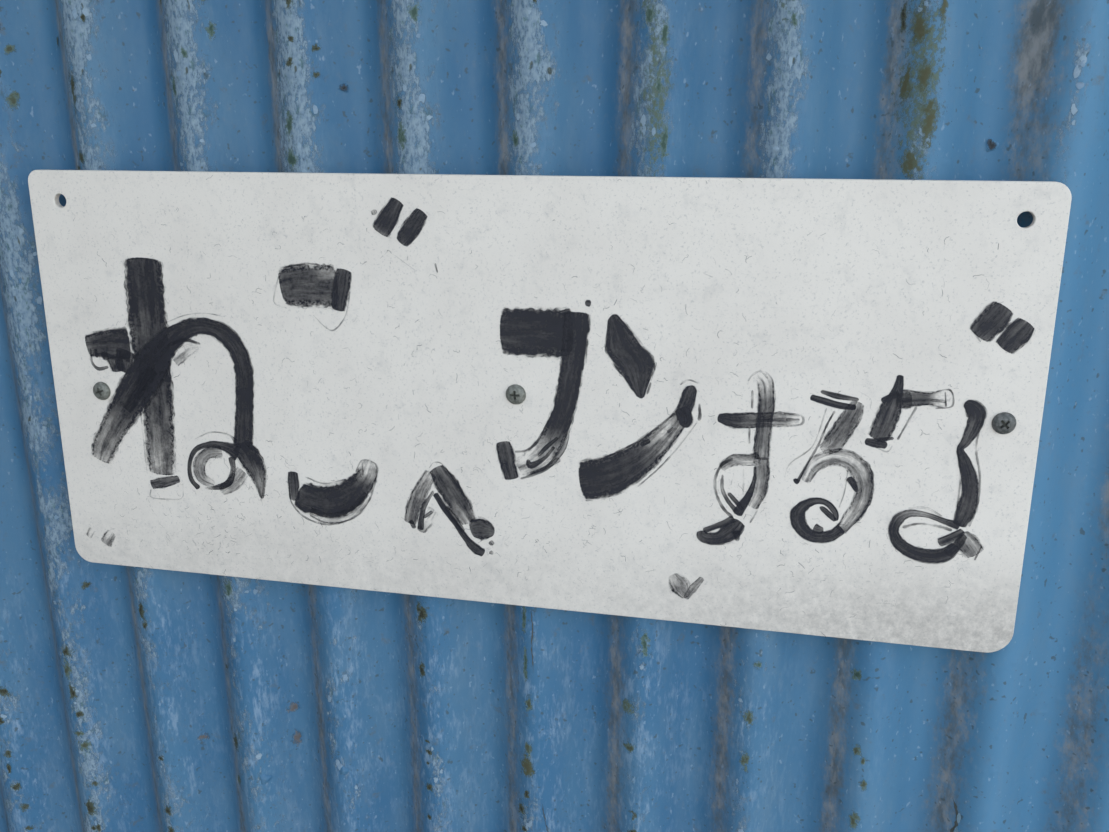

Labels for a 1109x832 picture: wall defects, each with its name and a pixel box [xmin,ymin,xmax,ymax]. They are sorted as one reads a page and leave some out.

corrosion [6,91,20,111]
corrosion [416,602,427,623]
corrosion [62,646,77,699]
corrosion [4,750,21,791]
corrosion [521,742,535,777]
corrosion [84,800,101,832]